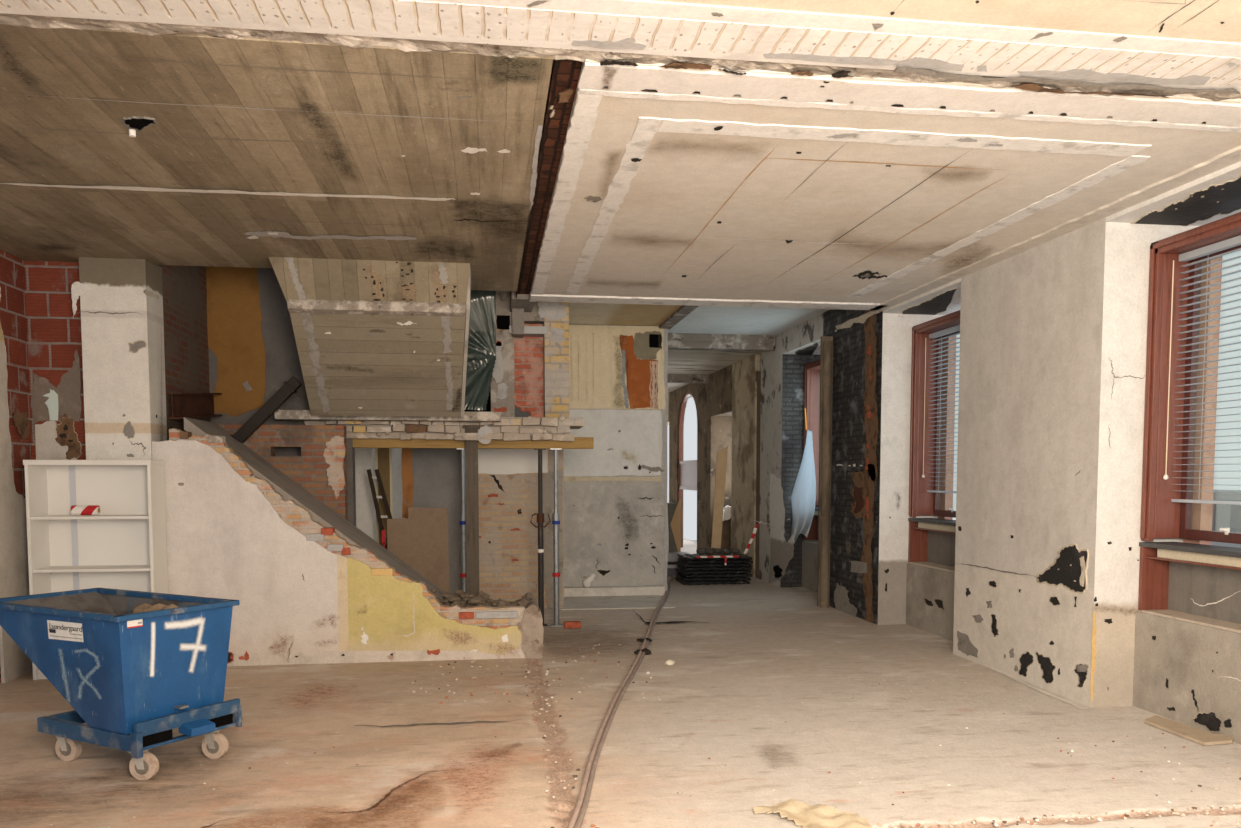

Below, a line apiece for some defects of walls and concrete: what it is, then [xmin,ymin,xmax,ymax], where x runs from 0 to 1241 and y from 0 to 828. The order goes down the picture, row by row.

flaking render [1130,175,1241,227]
flaking render [43,389,82,460]
flaking render [227,651,249,664]
flaking render [957,631,978,658]
flaking render [973,580,999,637]
flaking render [1004,543,1113,702]
flaking render [1191,690,1232,732]